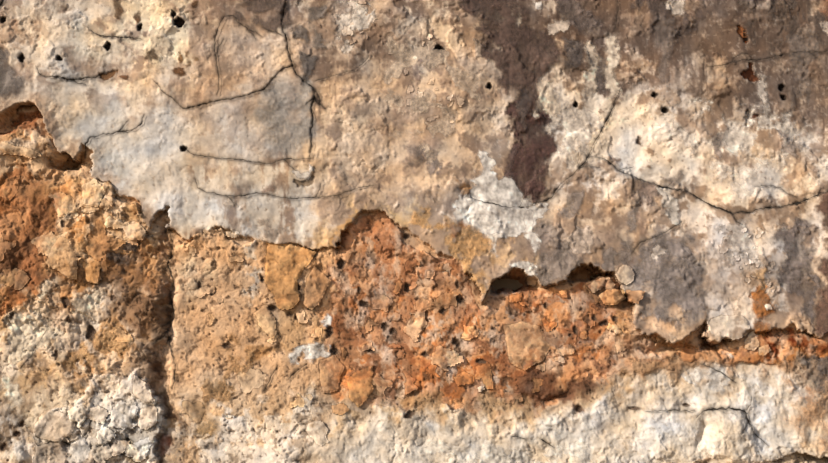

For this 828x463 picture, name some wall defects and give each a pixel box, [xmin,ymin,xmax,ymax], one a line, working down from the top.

damp [0,49,23,97]
crack [37,68,103,85]
crack [85,116,144,153]
crack [153,1,368,171]
crack [195,180,374,206]
spalling [0,114,828,463]
rust [445,222,493,293]
damp [452,0,620,286]
crack [467,81,828,225]
damp [593,171,705,329]
damp [774,218,828,337]
damp [817,192,828,226]